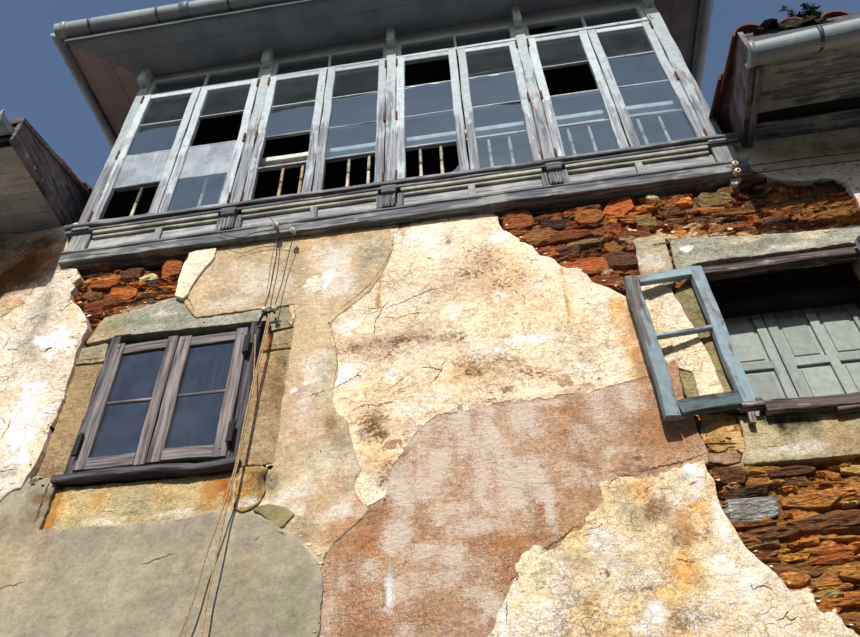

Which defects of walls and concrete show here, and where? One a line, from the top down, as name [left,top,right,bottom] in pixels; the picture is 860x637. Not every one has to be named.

damp [0,256,44,294]
crack [0,245,58,392]
flaking render [62,248,217,348]
crack [311,233,447,396]
flaking render [494,168,860,296]
crack [34,483,49,523]
flaking render [693,413,860,636]